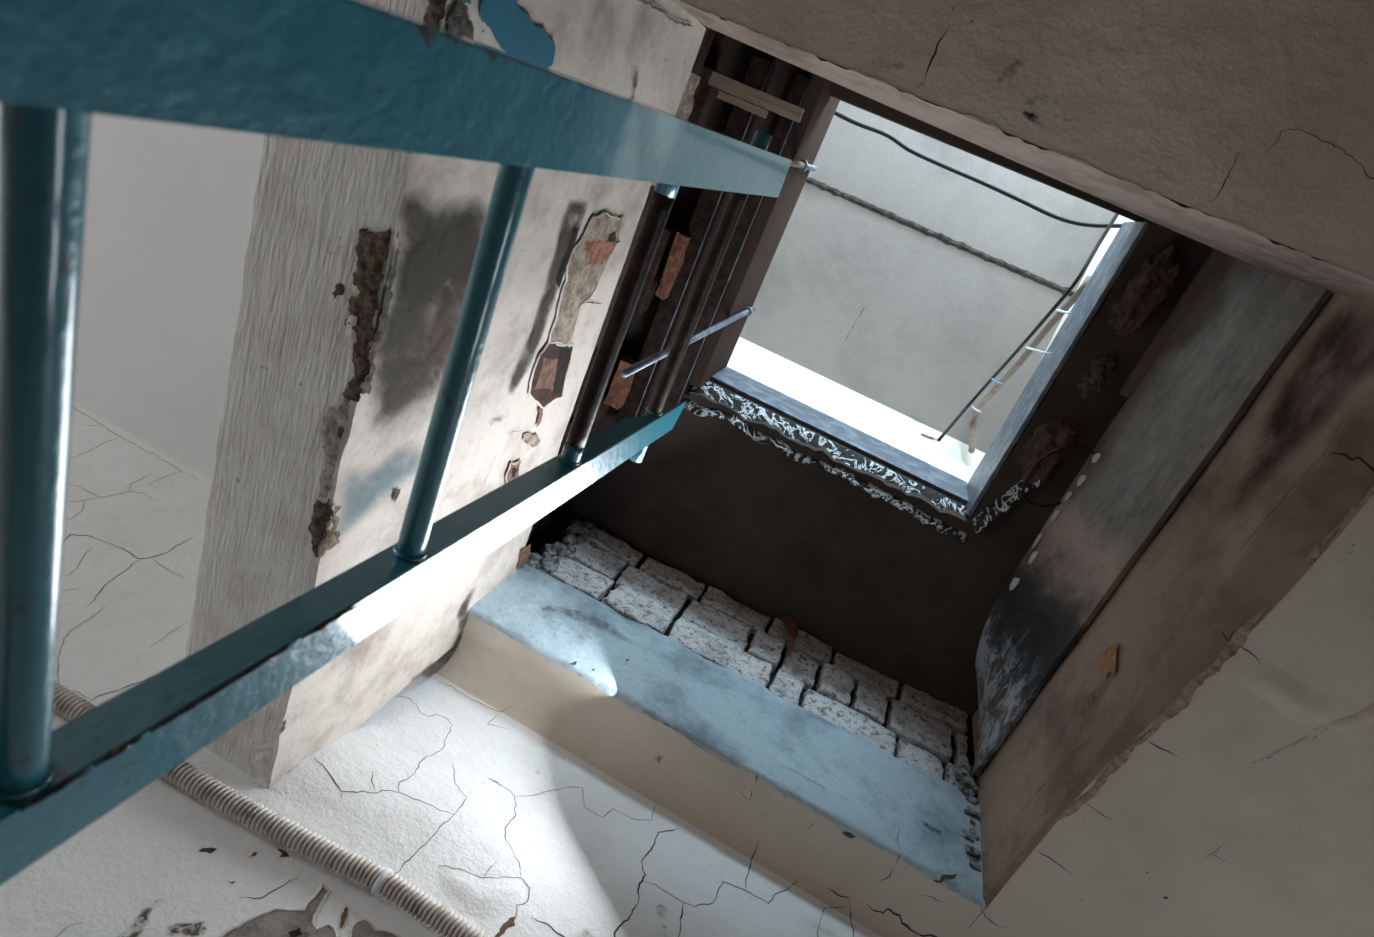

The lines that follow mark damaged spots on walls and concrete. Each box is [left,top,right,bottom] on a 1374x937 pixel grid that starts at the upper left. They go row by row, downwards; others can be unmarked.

spalling [423,0,474,40]
crack [638,0,692,26]
crack [1212,129,1374,201]
spalling [308,227,400,558]
flaking render [505,460,522,483]
flaking render [523,211,624,447]
crack [1235,388,1374,556]
water stain [1253,316,1374,478]
crack [57,407,198,702]
crack [288,684,937,937]
peeling [122,908,152,937]
flaking render [168,883,402,937]